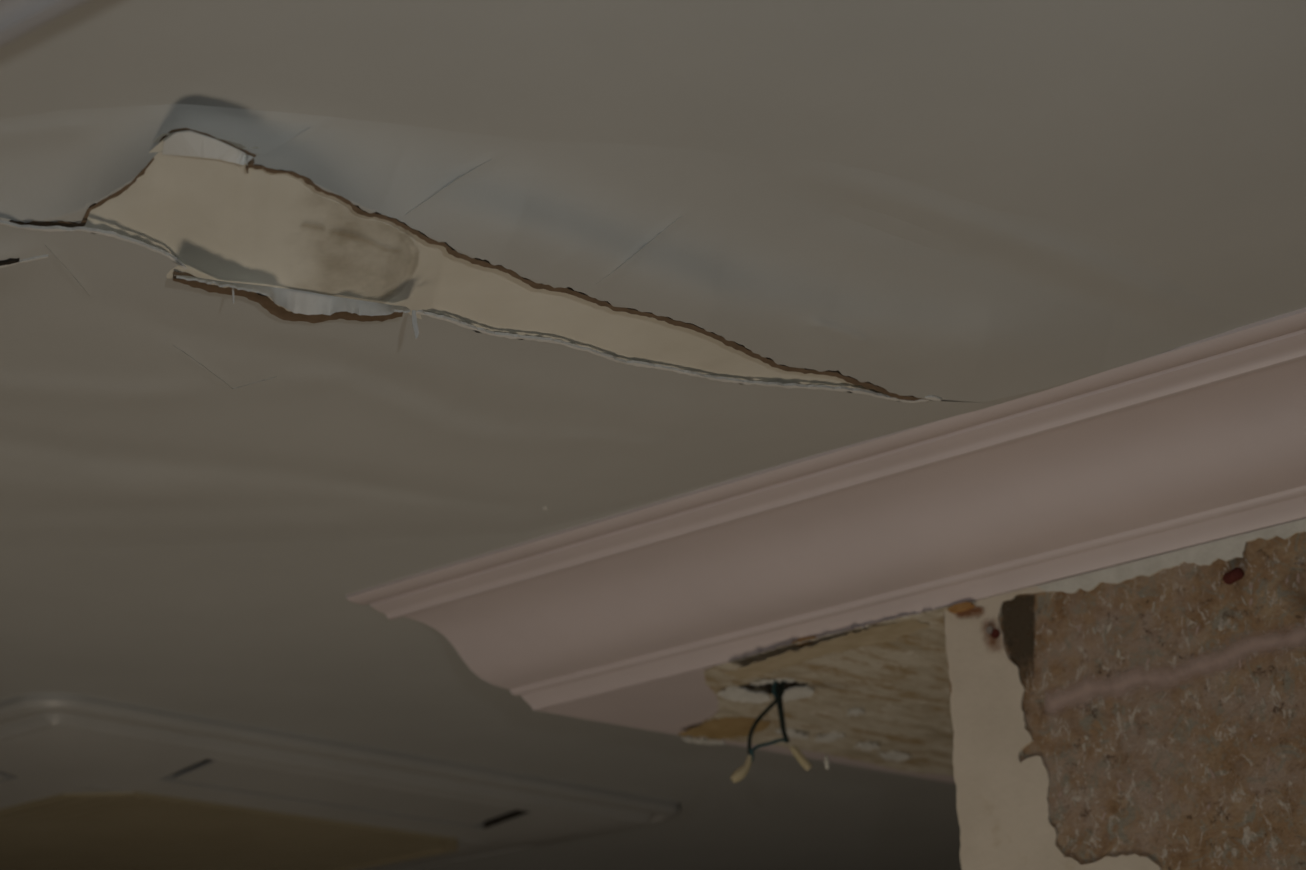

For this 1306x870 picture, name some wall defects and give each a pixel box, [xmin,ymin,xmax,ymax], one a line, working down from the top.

flaking render [678,606,954,776]
peeling [999,532,1306,870]